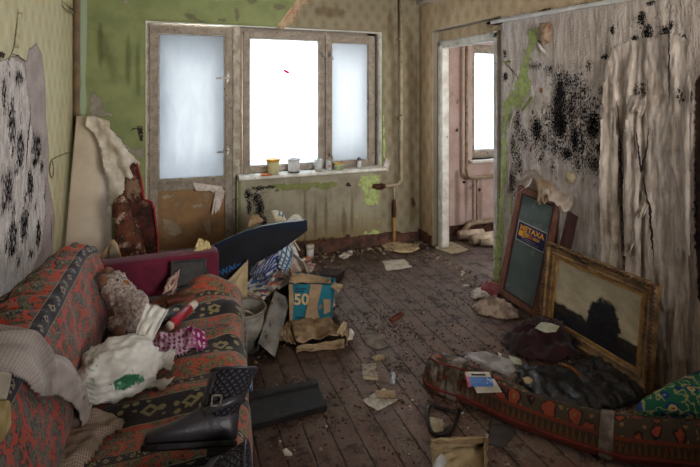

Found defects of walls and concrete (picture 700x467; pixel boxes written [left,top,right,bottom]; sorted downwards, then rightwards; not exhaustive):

water stain [630,0,686,41]
flaking render [0,51,46,297]
water stain [0,70,47,268]
water stain [244,185,279,226]
peeling [269,182,337,191]
peeling [346,113,391,206]
water stain [509,60,603,205]
peeling [595,61,652,276]
peeling [692,199,700,253]